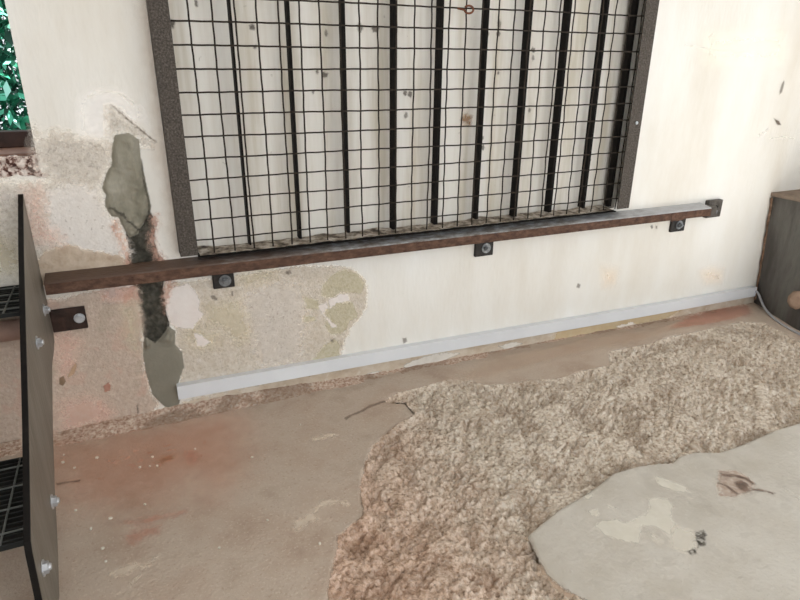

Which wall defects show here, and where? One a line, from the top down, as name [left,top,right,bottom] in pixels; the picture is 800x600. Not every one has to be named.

peeling [0,107,153,284]
peeling [165,265,367,383]
peeling [183,296,754,404]
spalling [327,322,800,600]